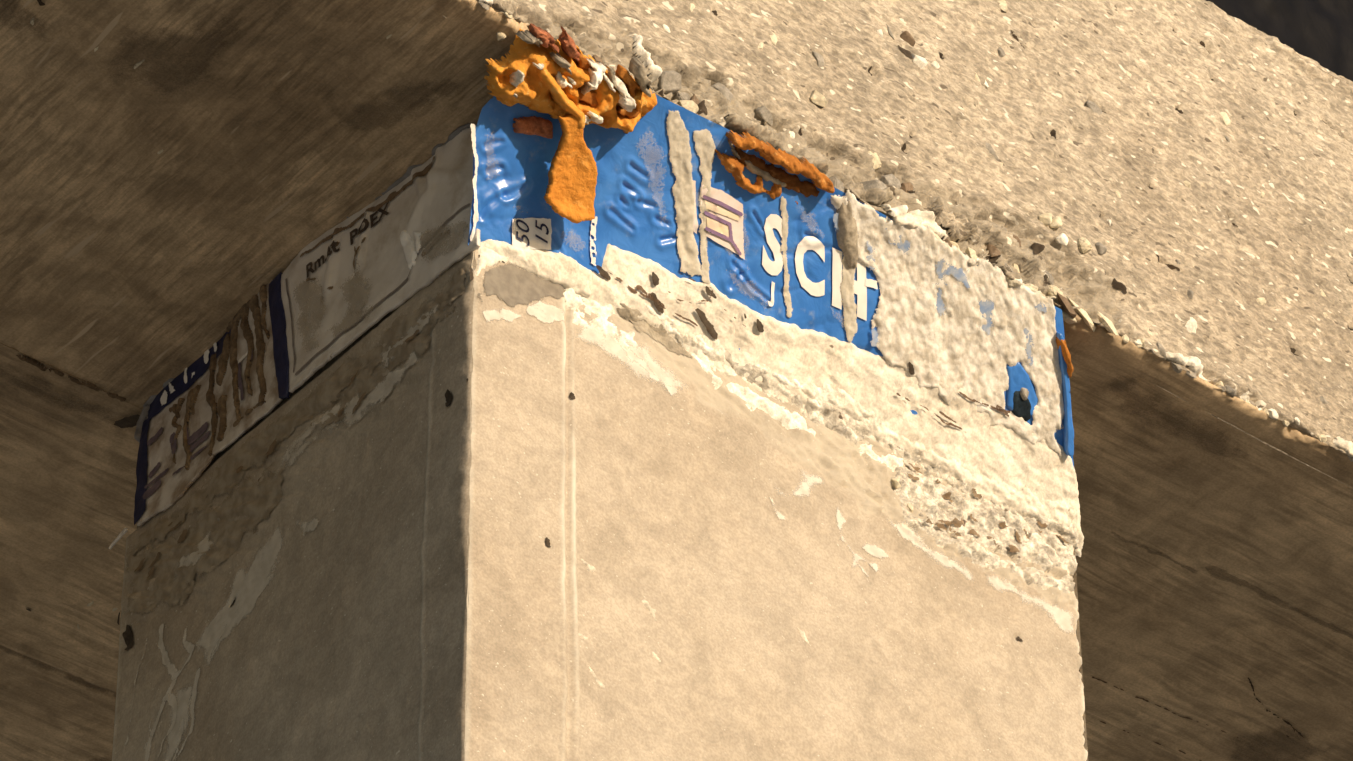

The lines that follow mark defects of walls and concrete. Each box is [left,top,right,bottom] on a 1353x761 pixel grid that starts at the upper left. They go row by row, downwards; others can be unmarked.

spalling [632,35,1300,426]
spalling [469,239,1079,593]
spalling [1317,434,1353,462]
spalling [117,612,134,651]